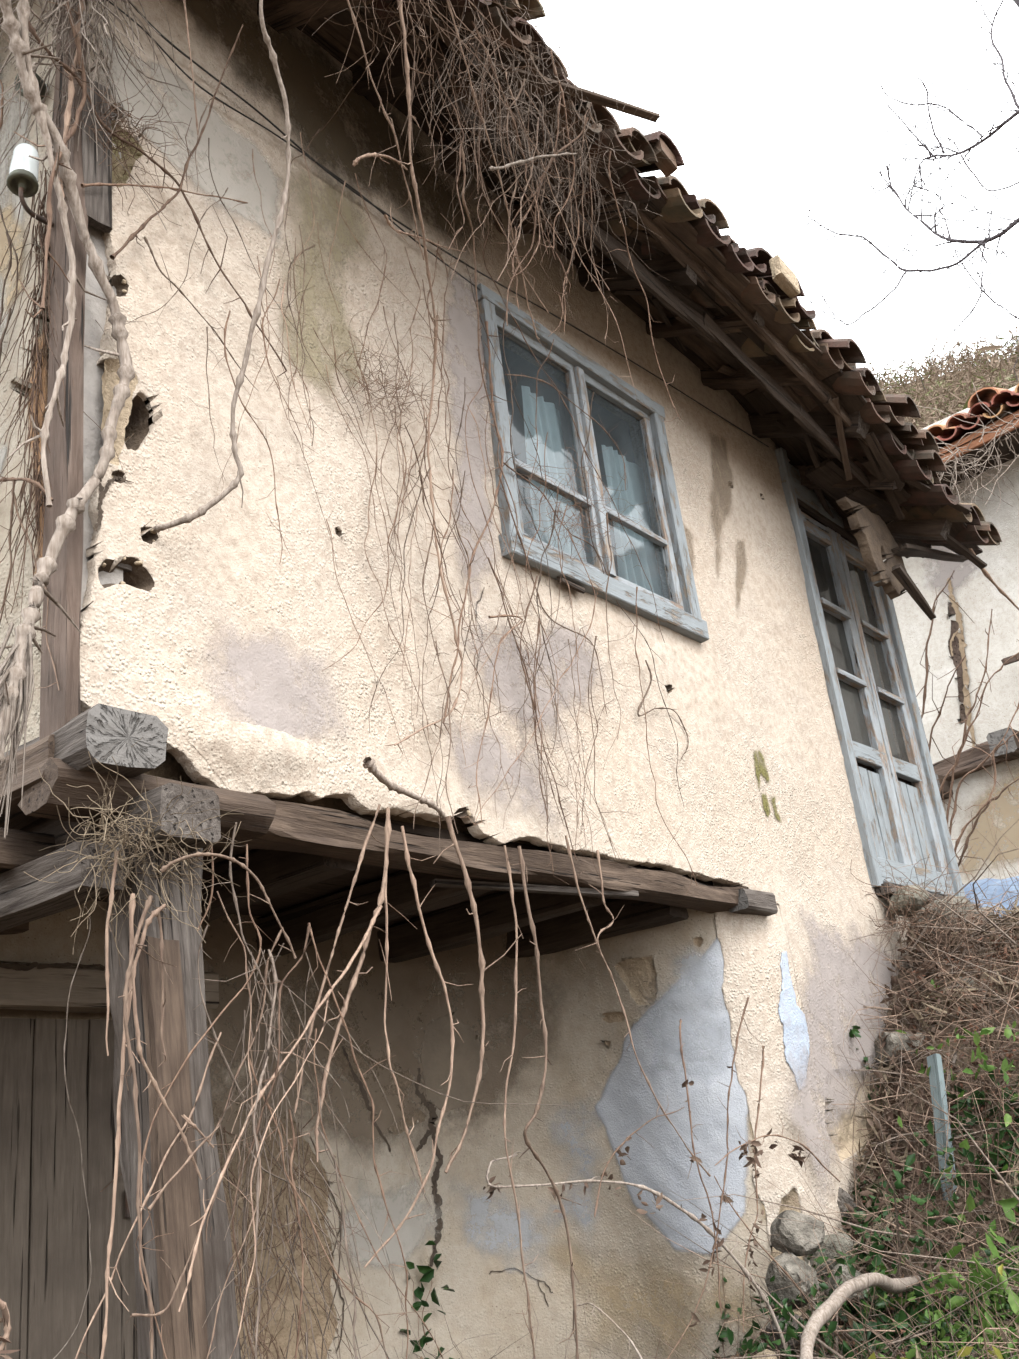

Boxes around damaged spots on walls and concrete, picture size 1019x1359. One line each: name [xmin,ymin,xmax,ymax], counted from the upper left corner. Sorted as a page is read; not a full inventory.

flaking render [101,358,149,483]
hole [98,556,156,592]
hole [141,526,159,544]
flaking render [454,807,471,818]
peeling [778,951,810,1090]
crack [342,1046,443,1267]
peeling [595,937,749,1255]
flaking render [762,1188,801,1215]